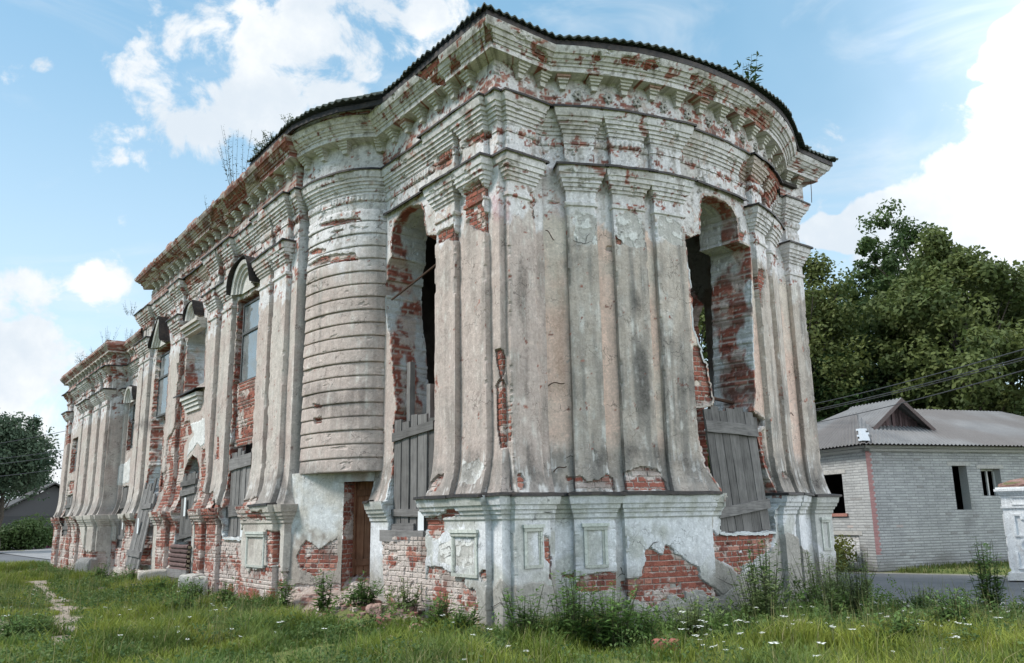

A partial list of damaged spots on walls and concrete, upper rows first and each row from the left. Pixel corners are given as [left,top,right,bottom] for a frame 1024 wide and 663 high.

spalling [418,59,461,86]
spalling [621,57,658,71]
spalling [690,75,717,101]
spalling [466,132,492,147]
spalling [463,180,489,233]
spalling [321,218,362,234]
spalling [310,249,358,267]
spalling [497,350,512,448]
spalling [50,336,342,600]
spalling [566,467,666,490]
spalling [426,509,487,626]
spalling [562,546,718,607]